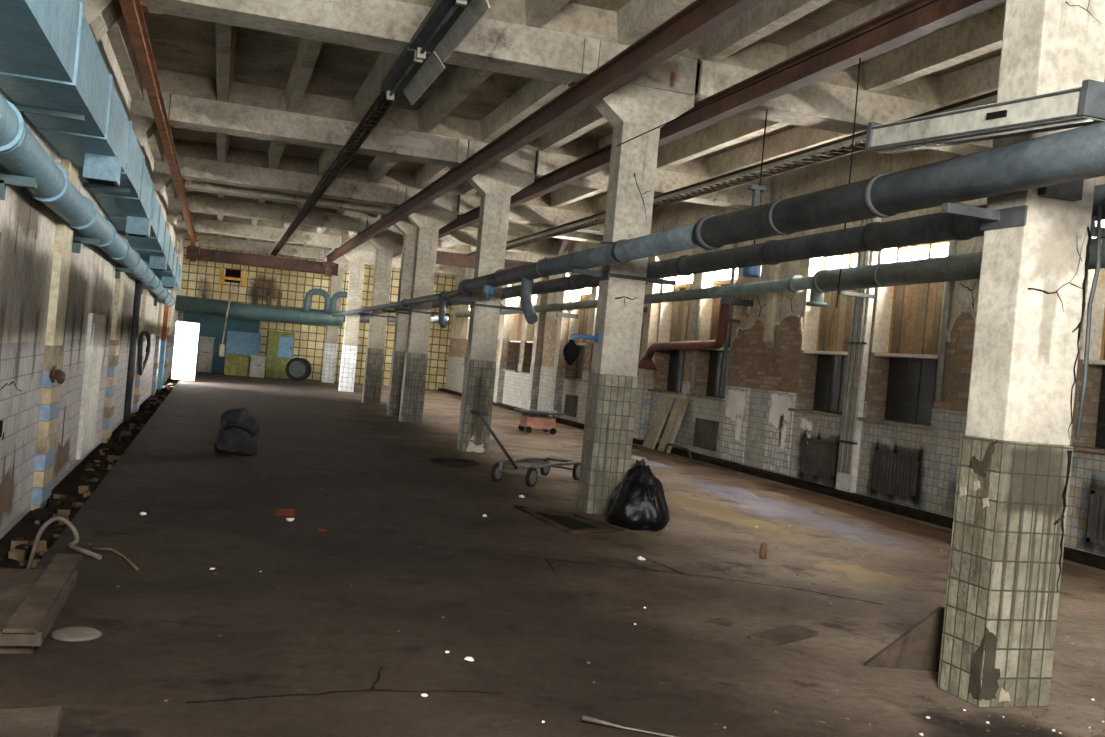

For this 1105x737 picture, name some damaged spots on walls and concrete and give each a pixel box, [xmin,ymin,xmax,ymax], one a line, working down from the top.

damp [15,200,38,259]
spalling [732,295,804,352]
spalling [960,440,998,509]
peeling [968,627,1011,702]